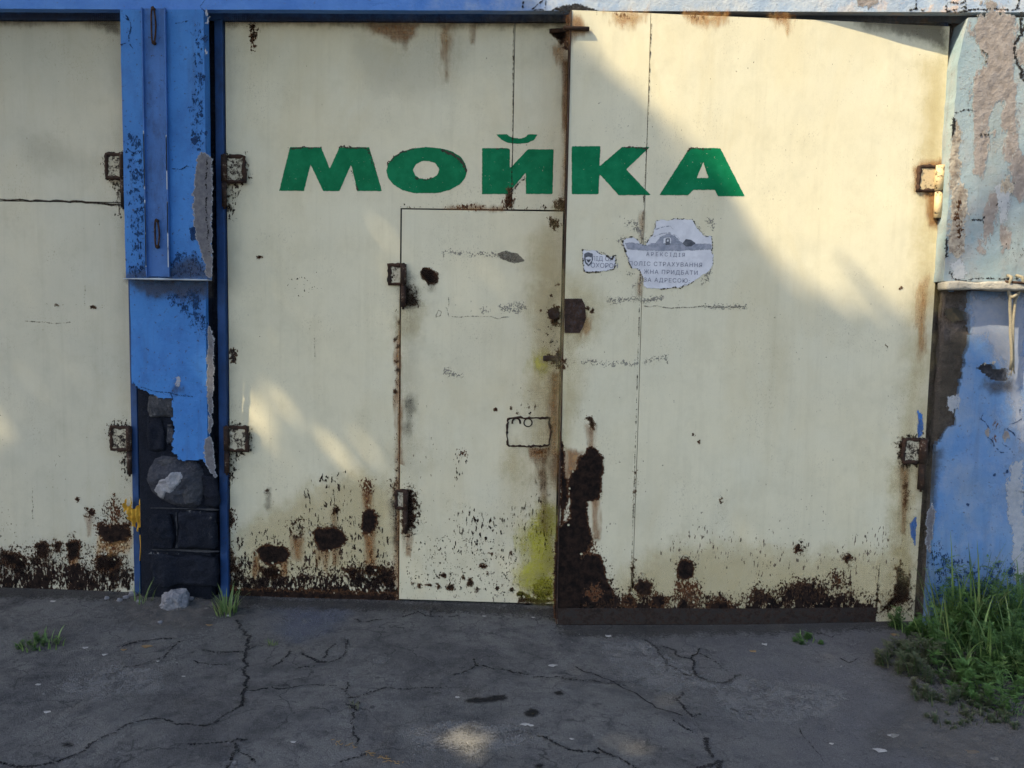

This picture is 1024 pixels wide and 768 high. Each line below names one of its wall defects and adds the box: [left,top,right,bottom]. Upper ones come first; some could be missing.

peeling [189,131,214,278]
peeling [931,0,1024,457]
corrosion [393,320,412,428]
corrosion [0,492,134,592]
spalling [146,326,221,588]
water stain [519,503,557,599]
corrosion [229,428,915,625]
corrosion [888,429,926,521]
peeling [925,501,937,553]
peeling [993,459,1024,581]
crack [0,606,793,768]